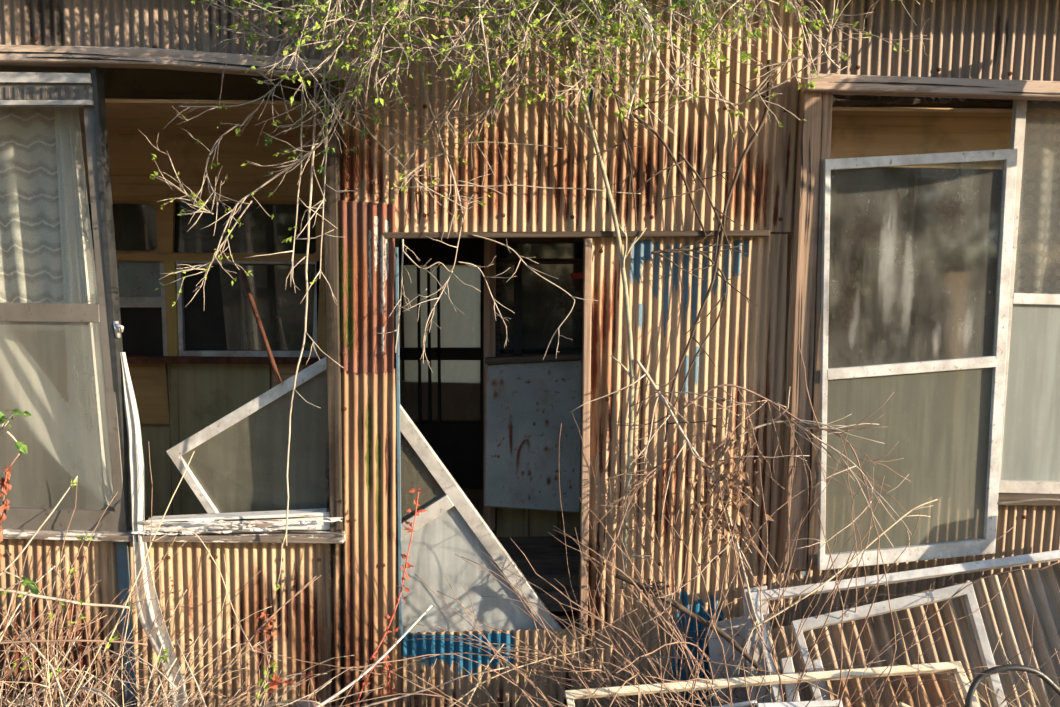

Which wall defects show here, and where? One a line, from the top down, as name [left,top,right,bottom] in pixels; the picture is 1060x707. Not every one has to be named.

corrosion [339,125,511,227]
corrosion [526,112,591,228]
corrosion [606,123,797,227]
peeling [368,216,389,313]
peeling [629,240,750,405]
corrosion [582,261,645,520]
peeling [132,519,281,535]
peeling [299,517,343,530]
corrosion [655,430,709,598]
corrosion [231,523,374,707]
peeling [401,632,514,678]
peeling [670,590,724,707]